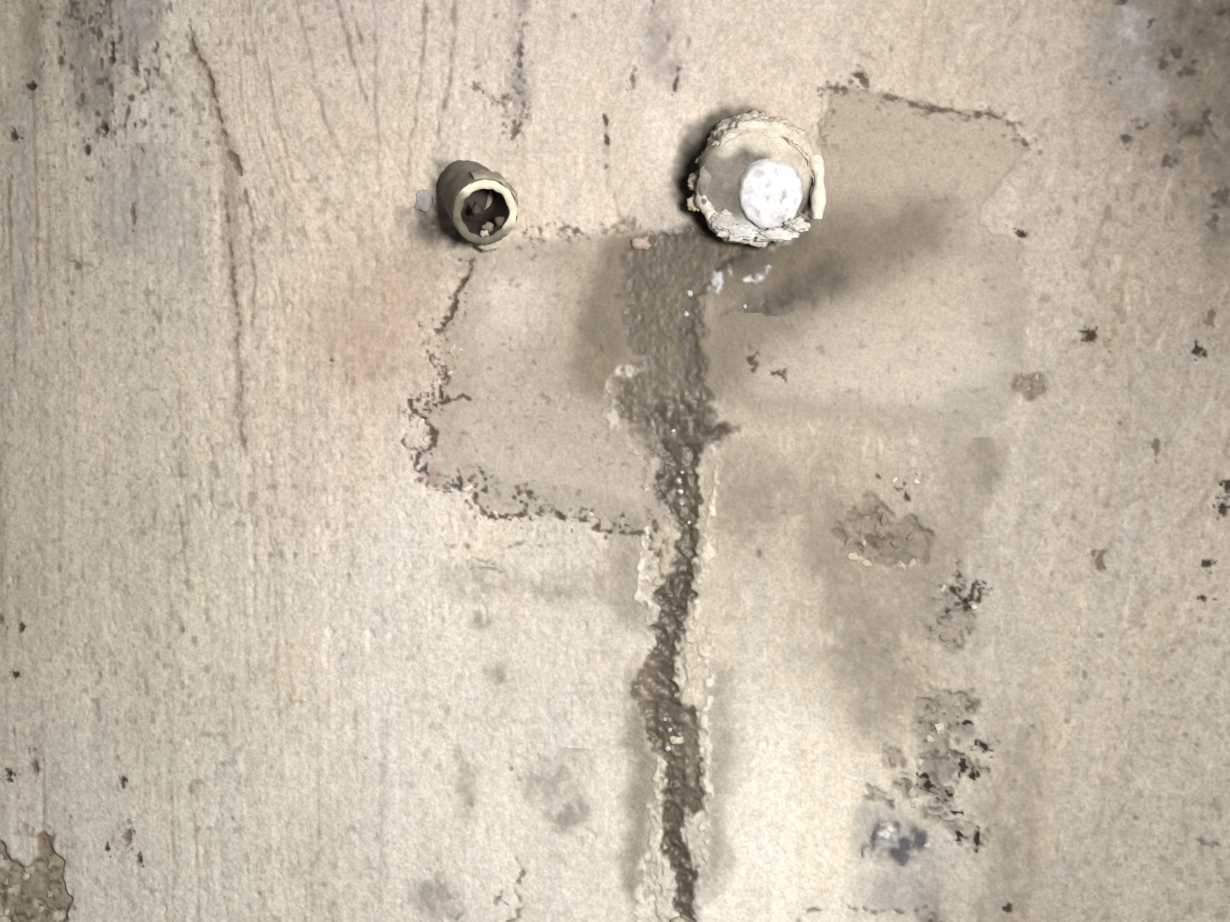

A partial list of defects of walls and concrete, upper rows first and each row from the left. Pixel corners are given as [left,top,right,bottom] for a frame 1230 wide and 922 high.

crack [401,259,665,557]
water stain [581,110,929,922]
flaking render [835,504,931,573]
flaking render [927,604,974,648]
flaking render [866,691,993,852]
flaking render [0,832,73,922]